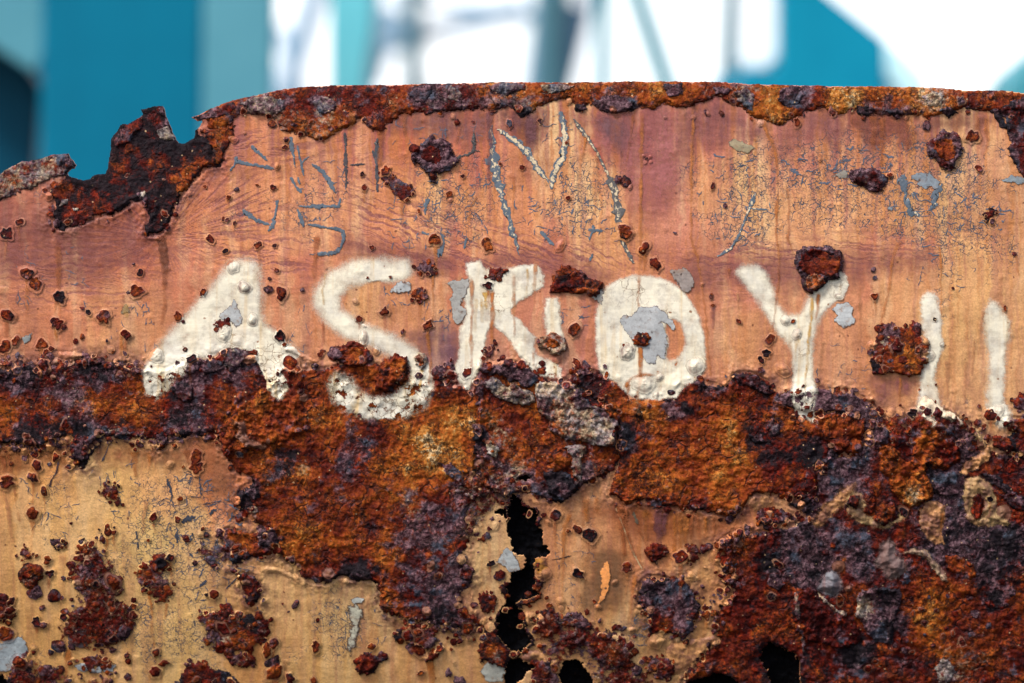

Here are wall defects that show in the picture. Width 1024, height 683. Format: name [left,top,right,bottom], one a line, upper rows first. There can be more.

crack [378,113,621,250]
rust [0,81,1024,273]
crack [697,143,1014,291]
peeling [447,278,469,324]
peeling [620,305,676,364]
rust [0,232,1024,683]
crack [20,459,264,611]
peeling [497,547,520,572]